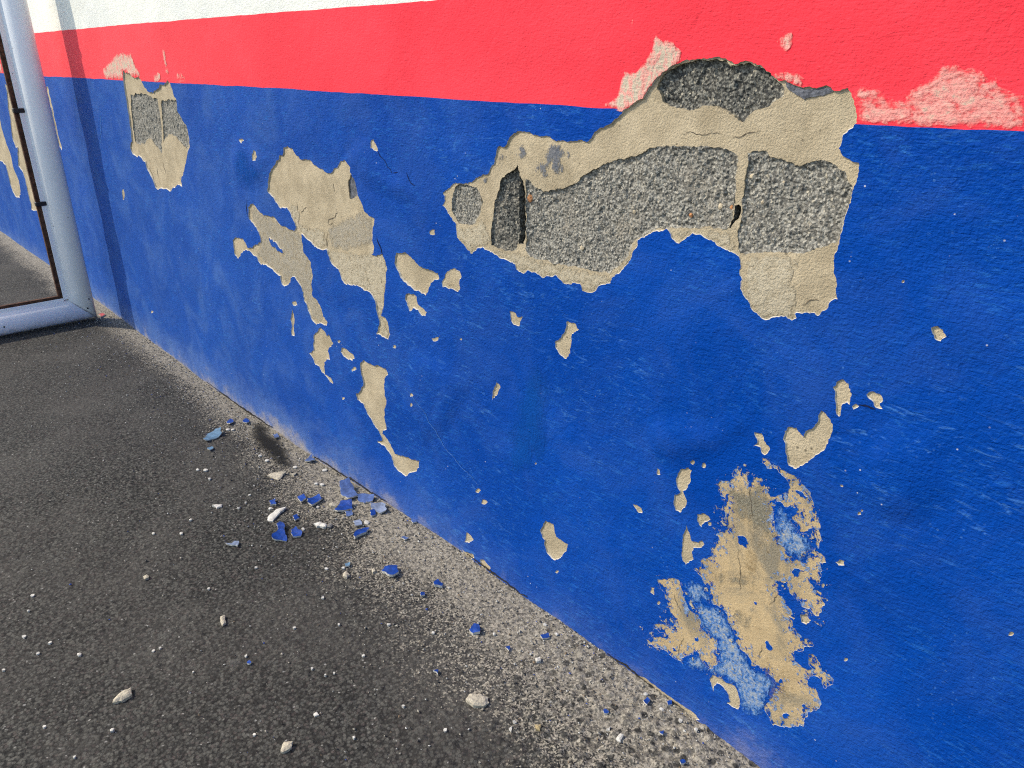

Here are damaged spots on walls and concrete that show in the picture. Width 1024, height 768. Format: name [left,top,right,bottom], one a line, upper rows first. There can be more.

peeling [0,84,37,211]
spalling [103,53,190,191]
spalling [442,37,1024,320]
peeling [233,146,461,476]
peeling [509,311,522,326]
peeling [555,321,579,359]
peeling [540,521,568,573]
peeling [634,379,883,727]